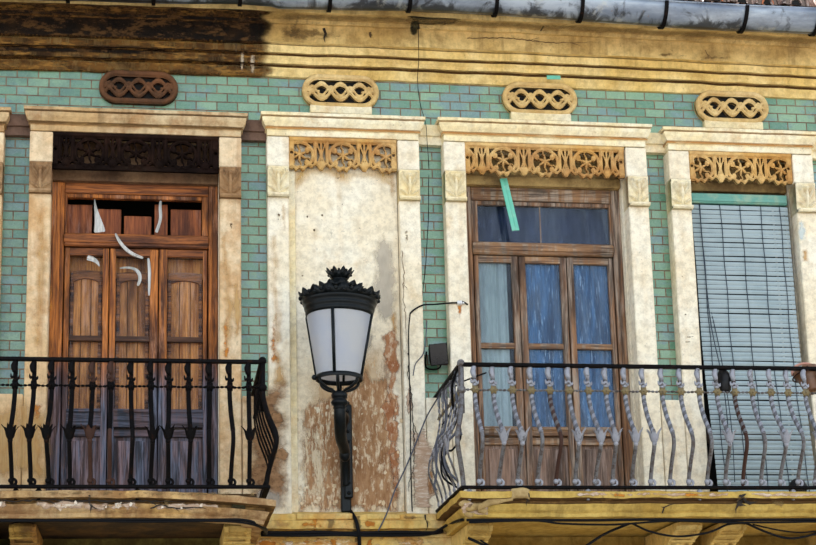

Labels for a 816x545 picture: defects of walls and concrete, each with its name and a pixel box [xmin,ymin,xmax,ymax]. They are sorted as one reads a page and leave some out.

damp [0,2,271,77]
crack [467,28,596,46]
damp [373,240,396,329]
peeling [37,500,137,511]
peeling [255,537,384,545]
peeling [395,537,424,545]